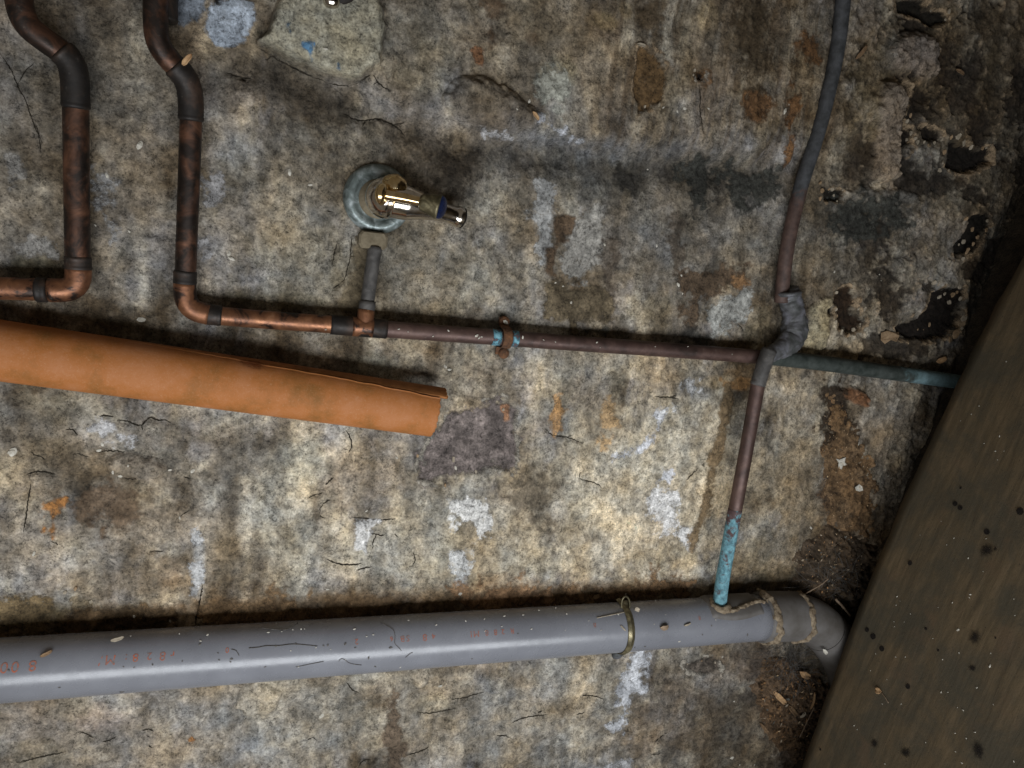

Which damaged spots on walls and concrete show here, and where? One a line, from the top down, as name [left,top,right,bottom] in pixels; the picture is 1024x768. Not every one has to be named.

crack [0,53,41,152]
peeling [905,113,987,173]
damp [526,178,621,337]
damp [667,153,783,346]
peeling [931,280,962,304]
peeling [958,216,988,261]
peeling [881,331,899,344]
damp [812,376,861,451]
damp [646,383,734,554]
rust [42,497,68,539]
damp [447,496,493,539]
damp [605,651,652,736]